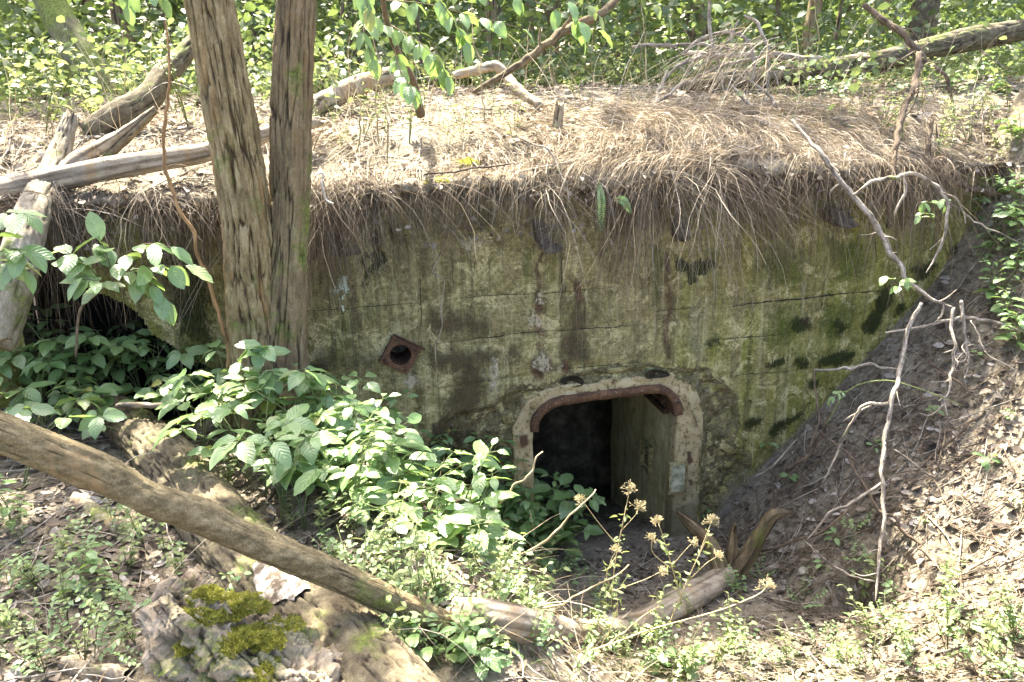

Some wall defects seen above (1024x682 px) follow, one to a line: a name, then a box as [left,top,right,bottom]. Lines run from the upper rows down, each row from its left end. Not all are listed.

crack [733,290,881,309]
leakage [533,354,563,372]